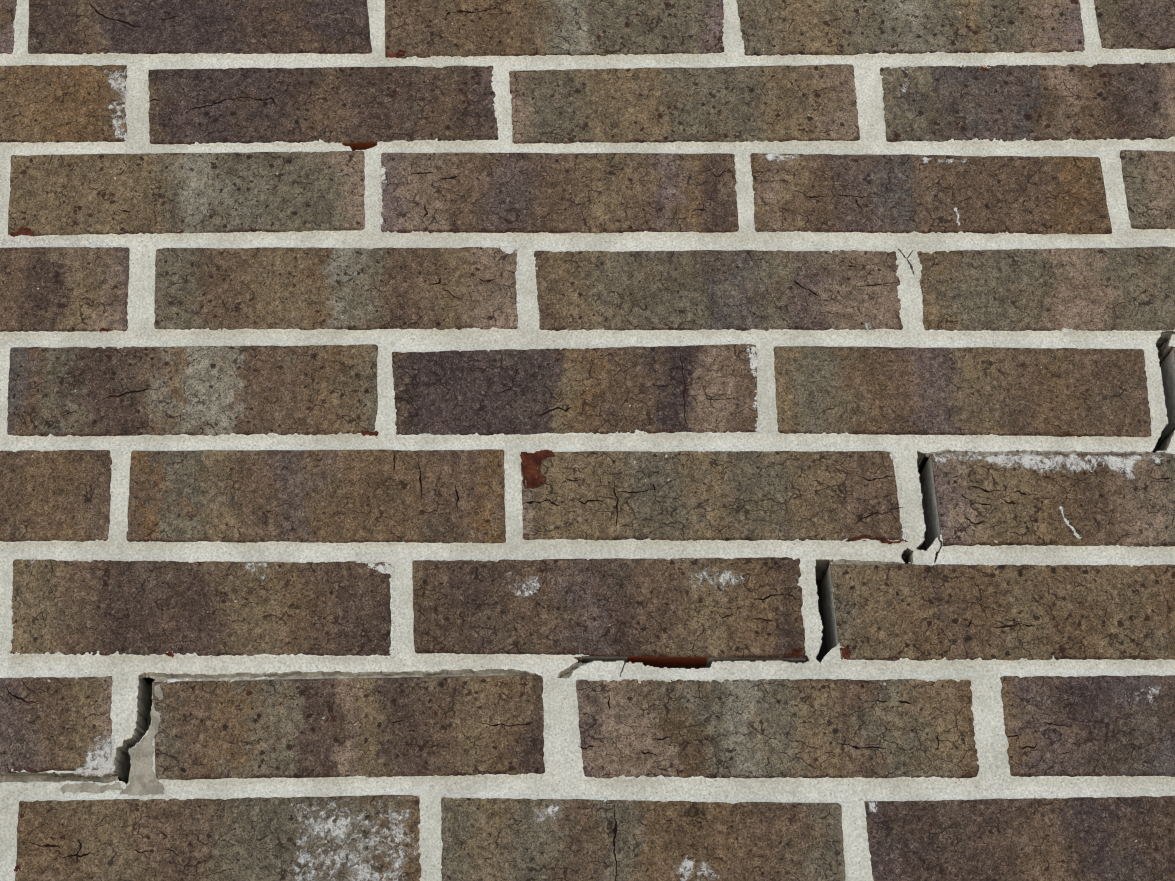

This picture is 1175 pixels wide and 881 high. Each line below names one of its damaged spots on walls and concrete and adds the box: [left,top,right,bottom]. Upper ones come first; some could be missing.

leakage [104,69,129,142]
crack [1156,330,1175,390]
crack [859,424,1175,503]
leakage [934,452,1162,479]
crack [715,485,1037,663]
crack [0,656,643,785]
leakage [295,799,418,881]